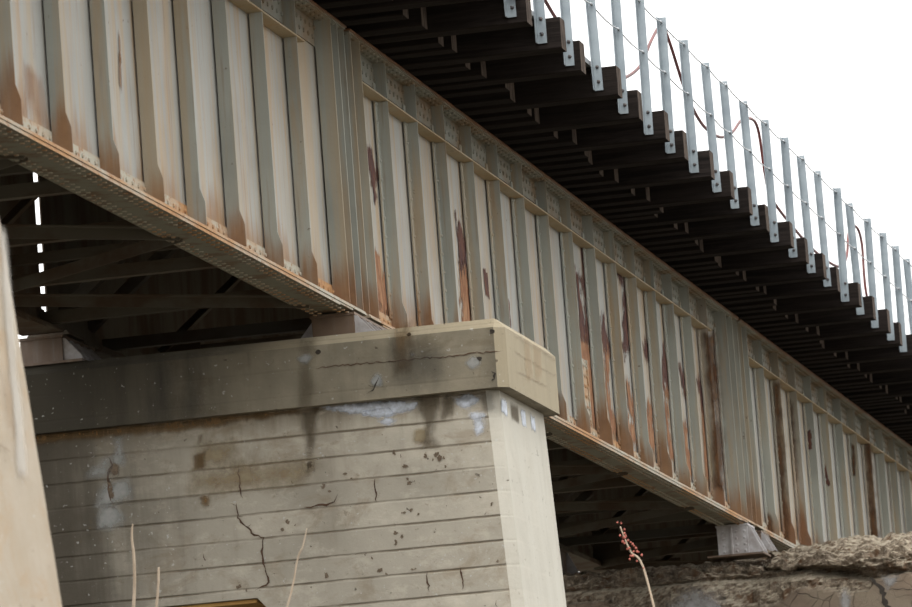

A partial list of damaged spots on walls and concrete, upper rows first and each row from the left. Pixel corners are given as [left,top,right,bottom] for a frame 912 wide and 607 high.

rust [459,263,472,322]
crack [315,336,556,393]
rust [580,332,597,429]
damp [305,409,316,452]
damp [327,394,483,445]
rust [701,334,725,490]
crack [107,456,115,508]
crack [233,465,270,590]
crack [870,577,912,607]